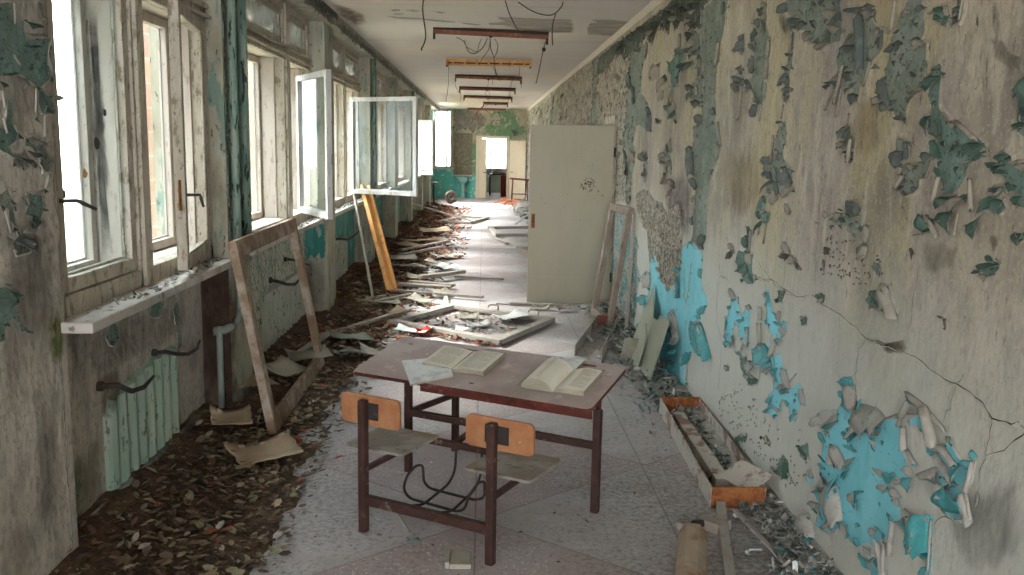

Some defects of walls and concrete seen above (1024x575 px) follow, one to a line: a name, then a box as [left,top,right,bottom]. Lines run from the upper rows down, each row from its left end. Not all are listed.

peeling [0,0,66,258]
peeling [452,0,1024,575]
crack [758,260,1024,507]